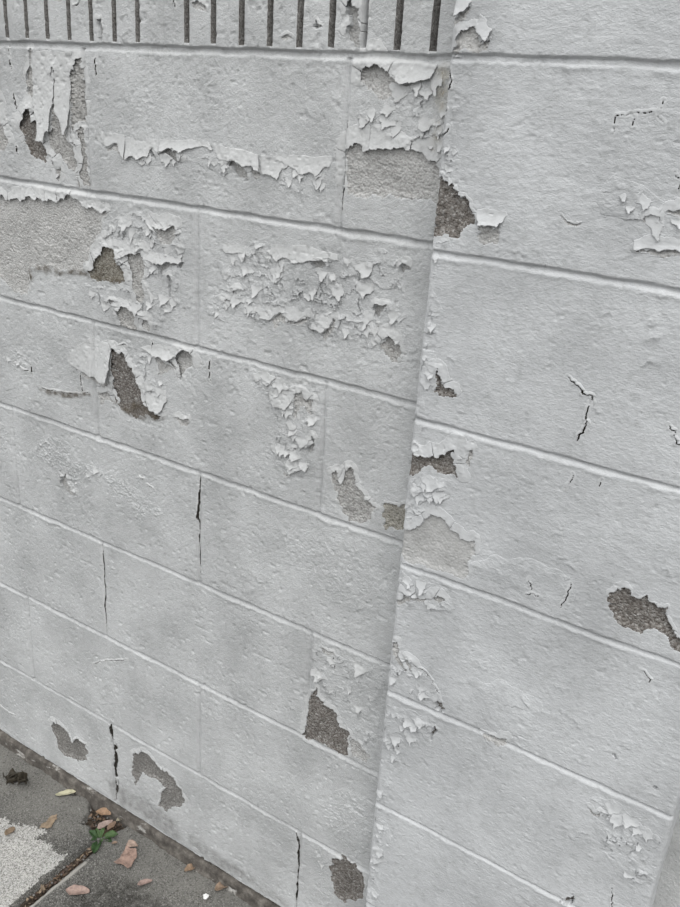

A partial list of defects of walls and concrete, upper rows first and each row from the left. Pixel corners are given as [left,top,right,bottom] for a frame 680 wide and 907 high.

peeling [338,0,438,100]
peeling [451,0,492,54]
peeling [0,43,507,331]
peeling [68,337,192,426]
crack [565,373,597,445]
peeling [409,431,477,483]
crack [562,471,605,492]
peeling [326,460,481,579]
peeling [605,580,680,652]
peeling [297,682,373,763]
peeling [130,747,188,812]
peeling [328,852,369,907]